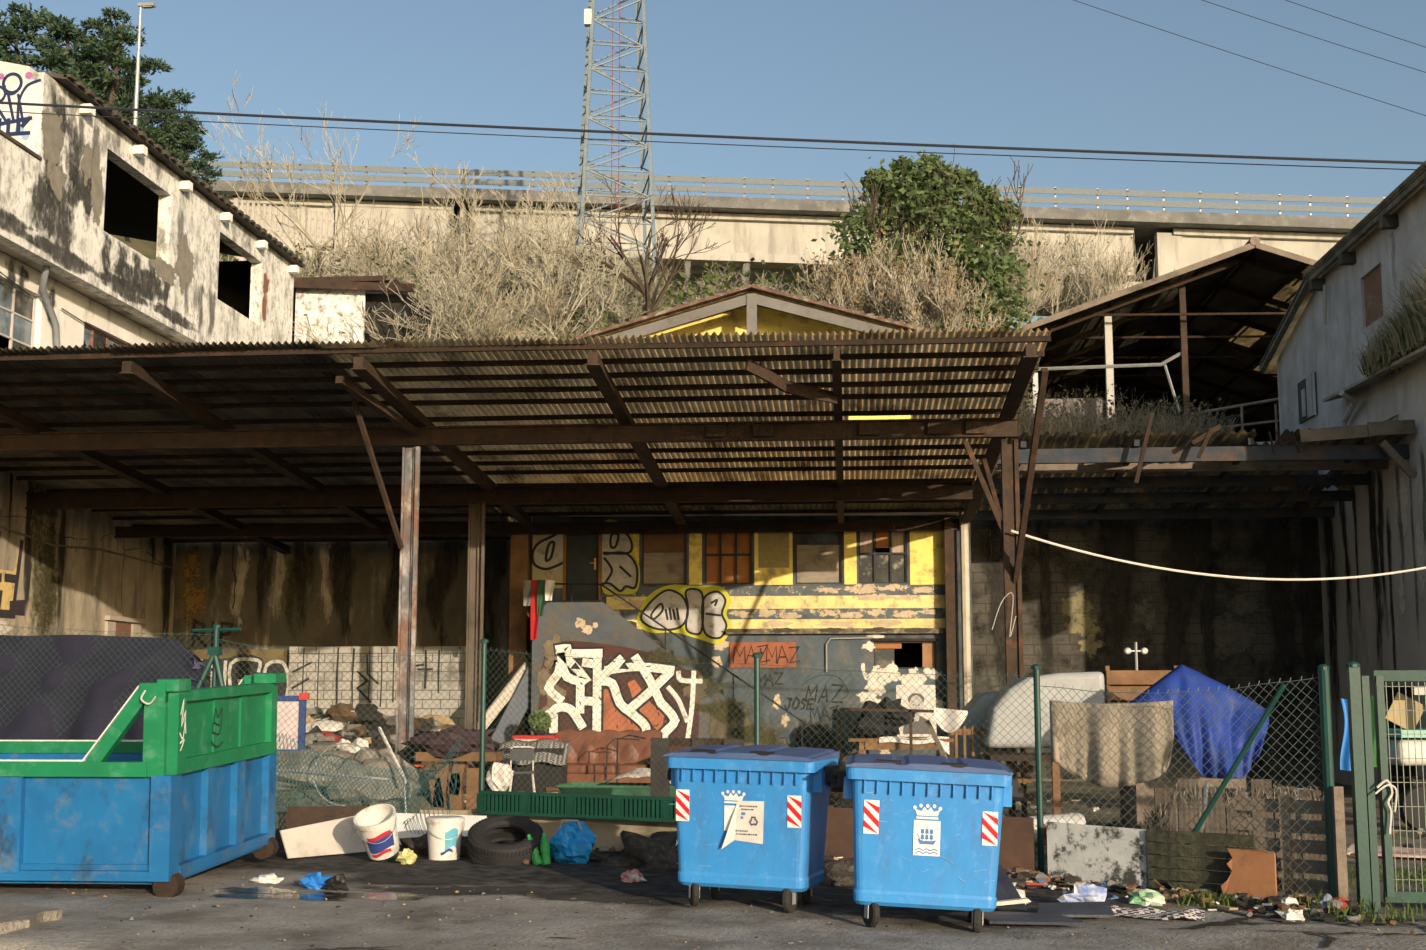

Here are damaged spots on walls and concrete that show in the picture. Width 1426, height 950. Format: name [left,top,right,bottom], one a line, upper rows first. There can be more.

leakage [0,96,215,332]
leakage [9,472,124,635]
leakage [140,538,355,641]
leakage [383,541,400,641]
leakage [421,541,462,645]
leakage [480,540,507,653]
peeling [682,584,940,746]
leakage [986,521,1006,687]
leakage [1036,451,1426,729]